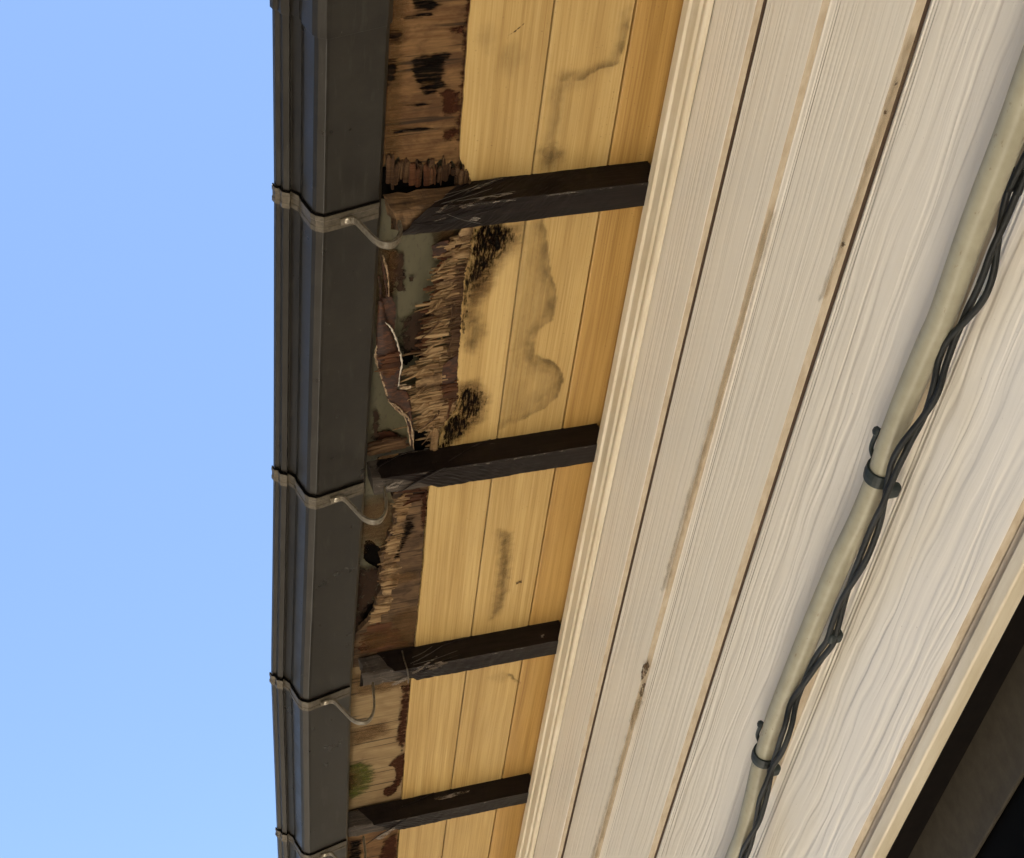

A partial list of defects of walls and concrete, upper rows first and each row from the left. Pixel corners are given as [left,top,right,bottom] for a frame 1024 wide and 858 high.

damp [386,0,451,152]
damp [462,225,515,348]
peeling [442,354,458,396]
damp [497,538,508,609]